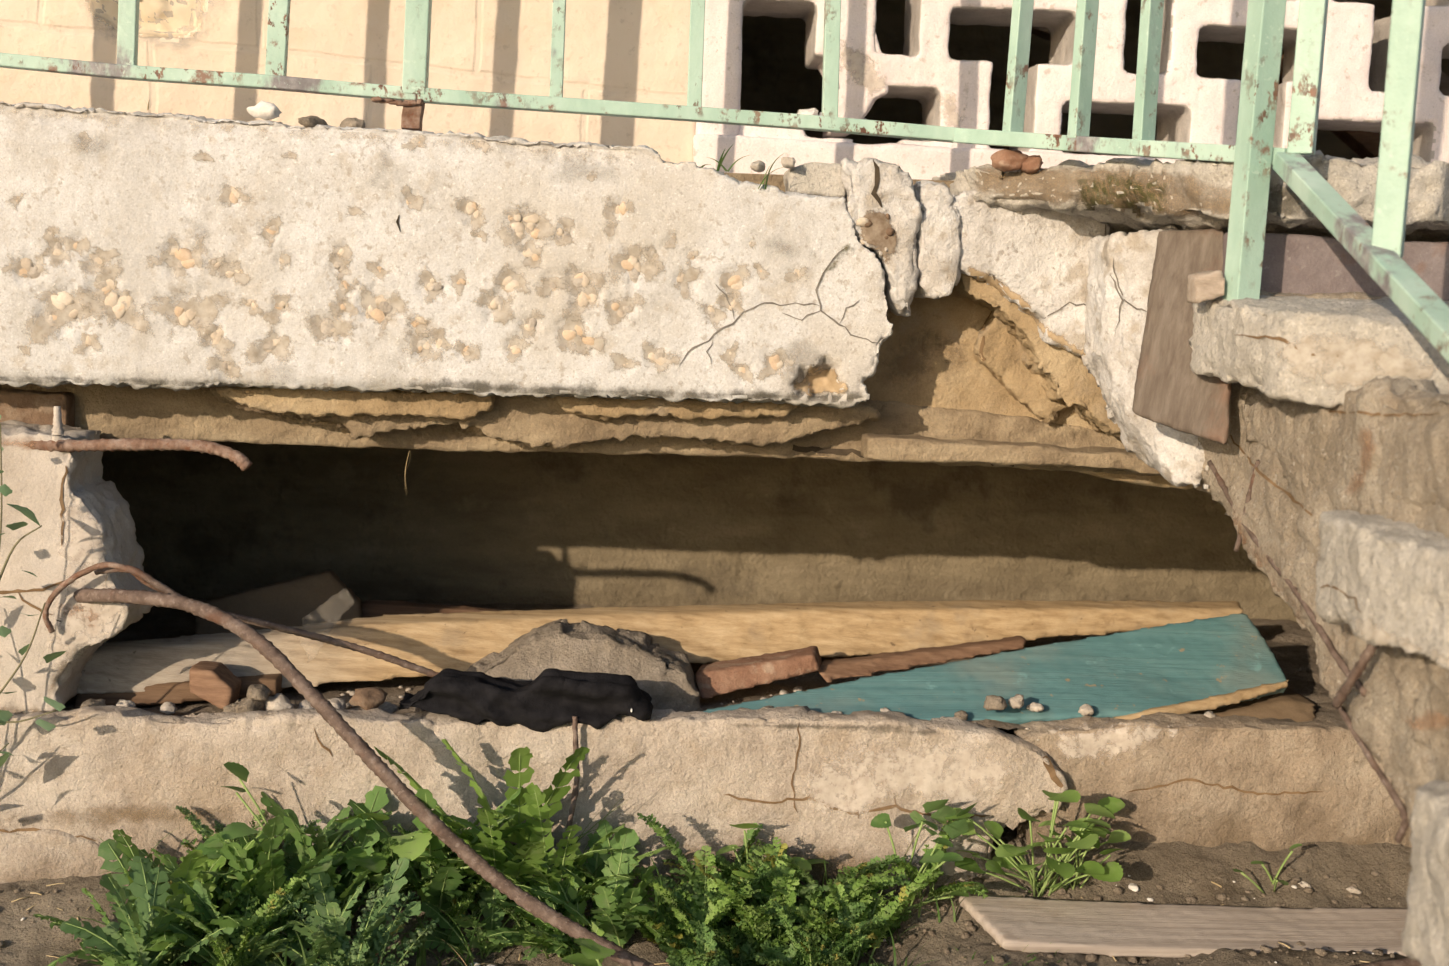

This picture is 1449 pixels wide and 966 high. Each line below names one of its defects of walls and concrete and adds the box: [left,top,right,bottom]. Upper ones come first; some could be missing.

peeling [90,0,118,27]
peeling [139,0,201,37]
spalling [218,184,250,206]
spalling [2,196,807,379]
crack [679,248,877,366]
spalling [968,267,1086,356]
spalling [720,341,848,396]
crack [59,466,69,546]
crack [0,580,86,626]
spalling [49,506,124,665]
crack [725,722,990,822]
crack [1126,778,1322,796]